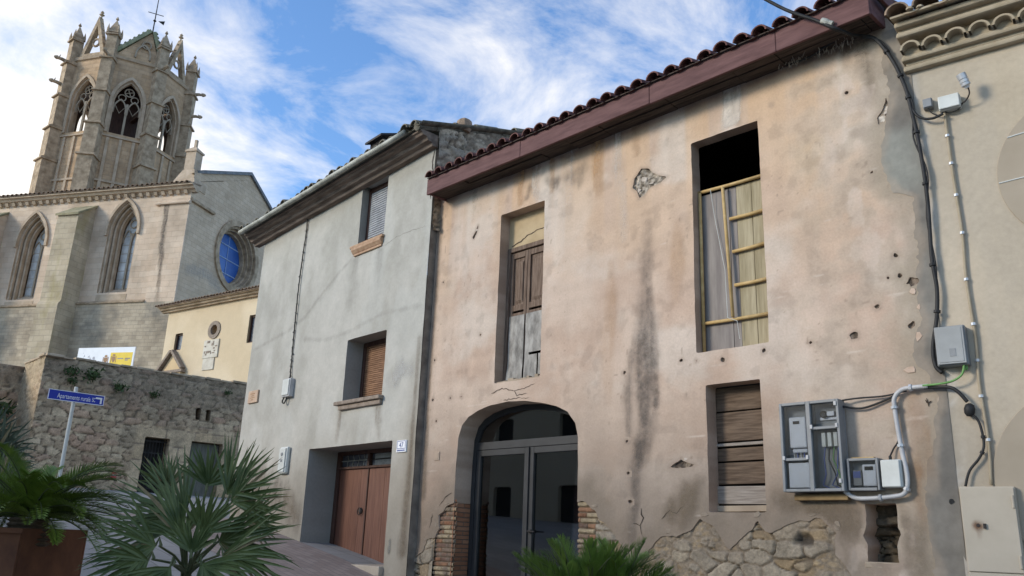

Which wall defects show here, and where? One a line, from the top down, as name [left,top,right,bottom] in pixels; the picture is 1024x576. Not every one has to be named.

flaking render [878,99,888,124]
flaking render [633,169,666,197]
water stain [633,364,650,510]
flaking render [673,458,694,468]
flaking render [414,499,470,576]
flaking render [577,501,621,557]
flaking render [631,511,851,576]